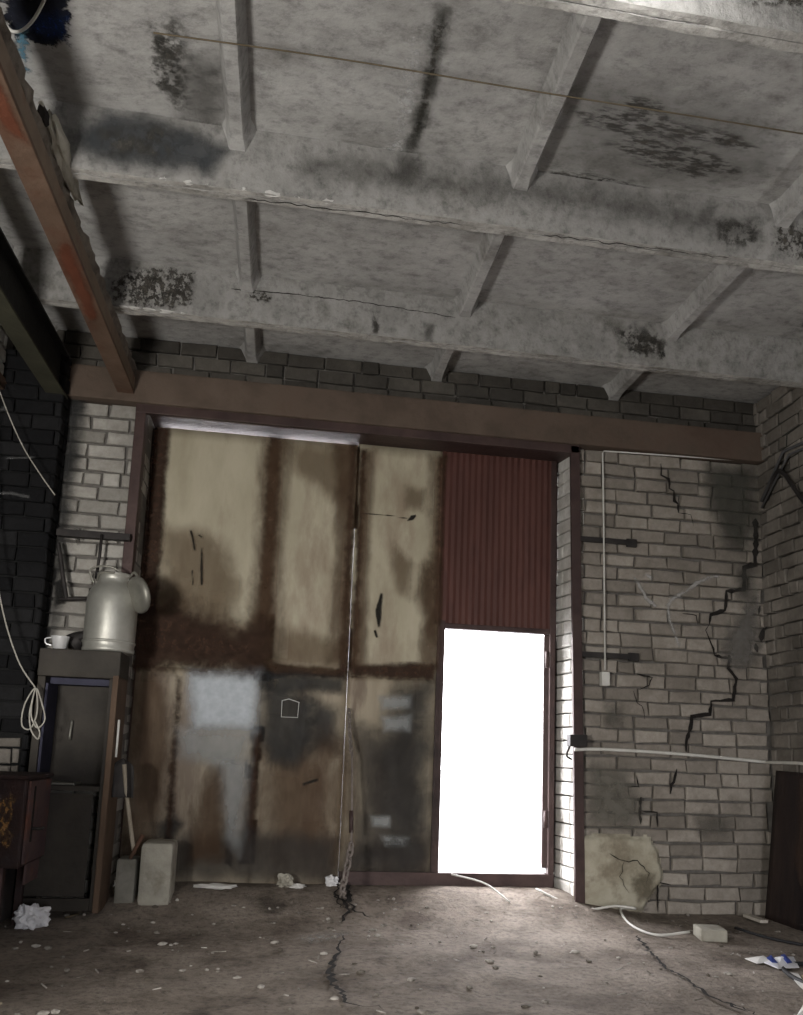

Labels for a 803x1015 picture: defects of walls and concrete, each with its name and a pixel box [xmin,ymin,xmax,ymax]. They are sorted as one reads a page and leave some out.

water stain [150,24,186,104]
water stain [389,12,447,151]
water stain [719,222,757,244]
water stain [775,225,803,259]
water stain [111,267,195,309]
water stain [618,330,665,359]
crack [660,466,694,526]
corrosion [132,426,445,857]
crack [628,518,759,827]
crack [611,854,670,911]
crack [325,882,379,1007]
crack [635,935,755,1015]